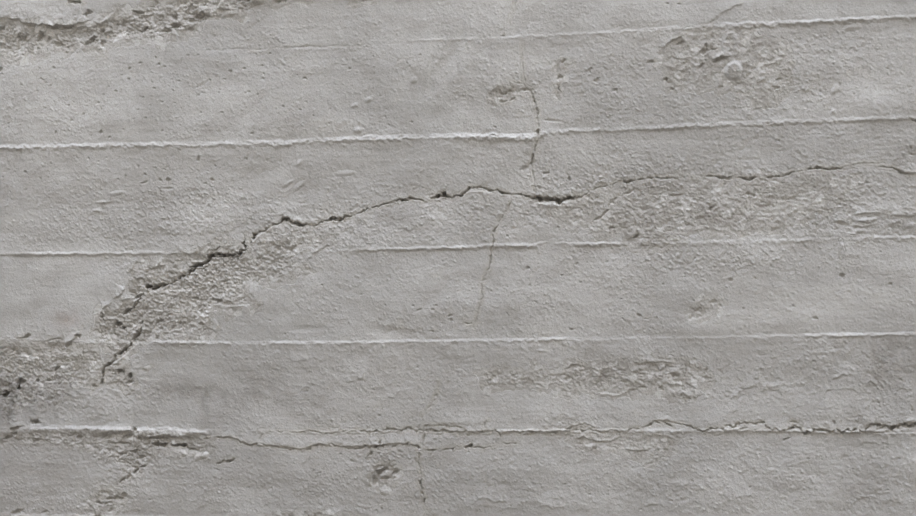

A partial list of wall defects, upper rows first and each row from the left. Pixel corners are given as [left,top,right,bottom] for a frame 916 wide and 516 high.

spalling [0,0,333,67]
crack [90,39,916,392]
spalling [0,228,338,516]
crack [185,416,916,516]